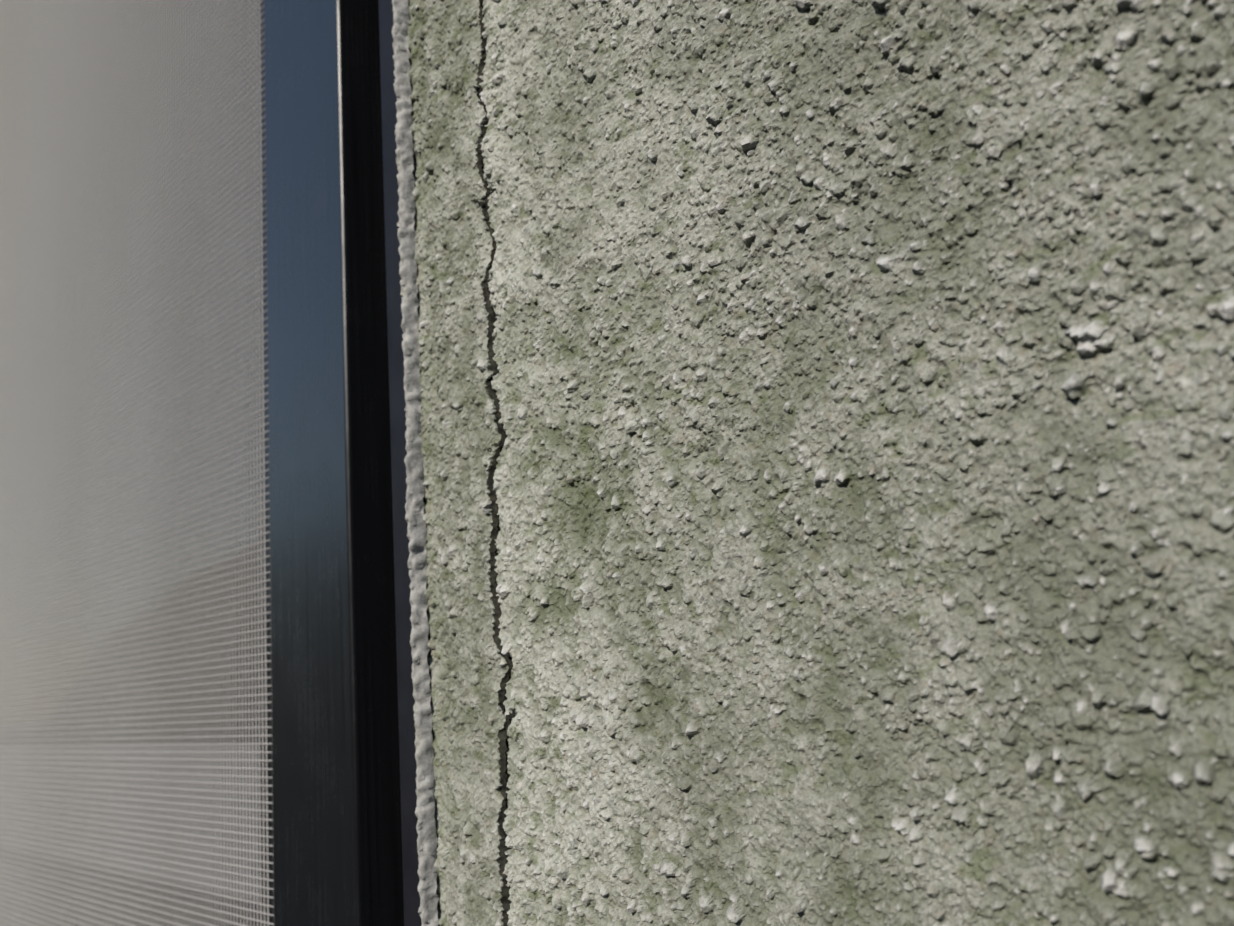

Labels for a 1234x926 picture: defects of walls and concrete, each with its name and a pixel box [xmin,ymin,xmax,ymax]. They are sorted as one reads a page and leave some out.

crack [471,0,515,926]